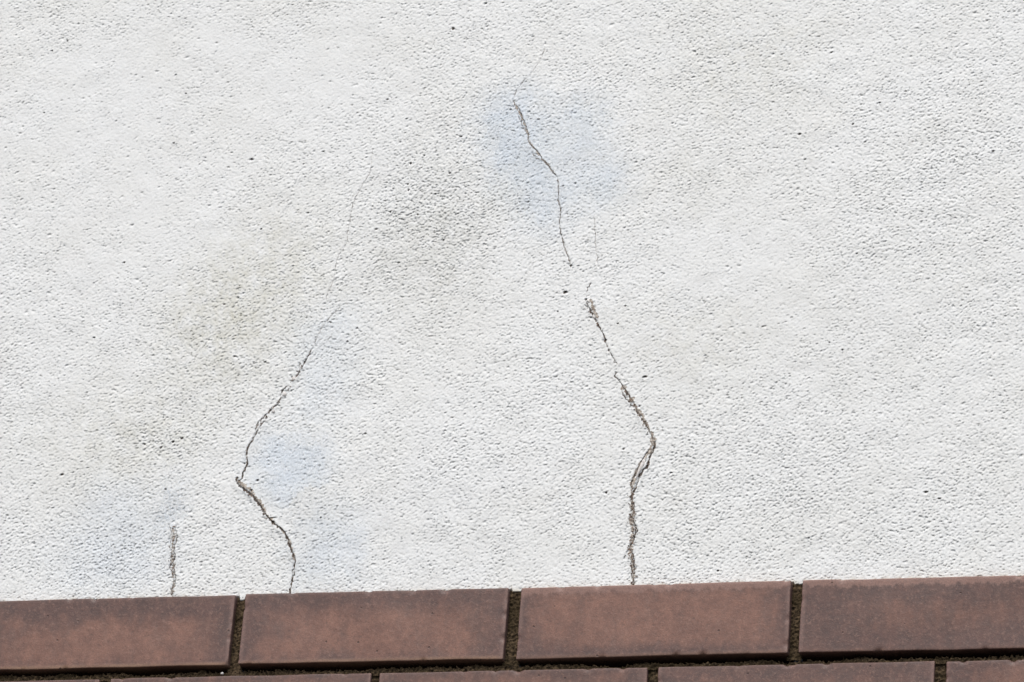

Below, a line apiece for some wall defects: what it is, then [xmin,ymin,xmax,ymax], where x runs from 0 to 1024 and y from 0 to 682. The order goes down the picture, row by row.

crack [168,524,178,597]
crack [235,167,371,593]
crack [513,48,657,585]